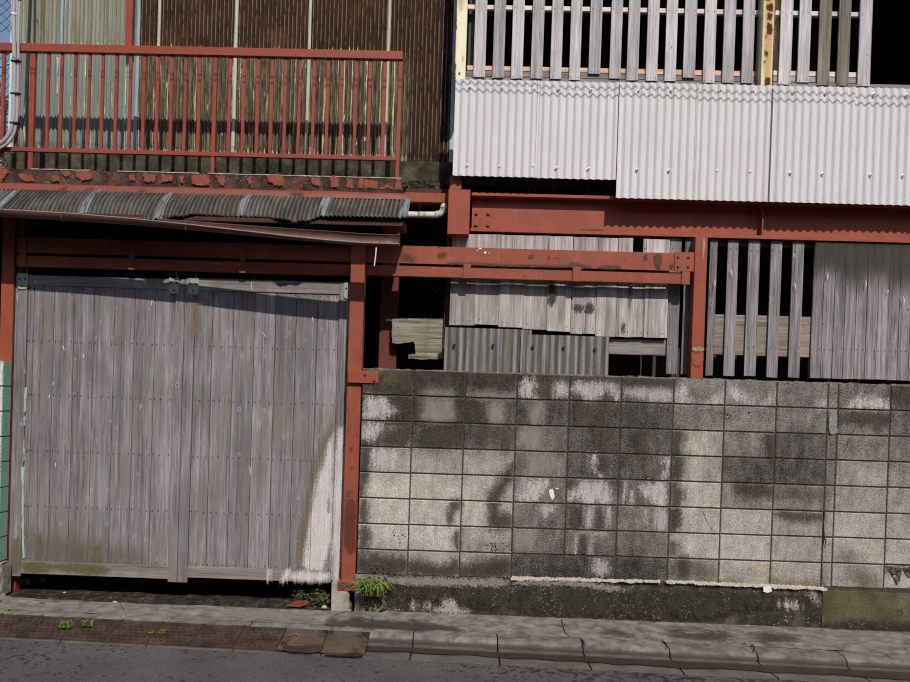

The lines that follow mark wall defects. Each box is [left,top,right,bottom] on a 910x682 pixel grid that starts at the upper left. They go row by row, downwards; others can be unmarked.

corrosion [766,0,774,78]
peeling [0,167,35,182]
peeling [51,170,94,182]
peeling [129,173,225,186]
peeling [267,175,284,186]
peeling [311,176,402,190]
water stain [818,387,910,430]
water stain [281,427,345,583]
water stain [326,372,823,634]